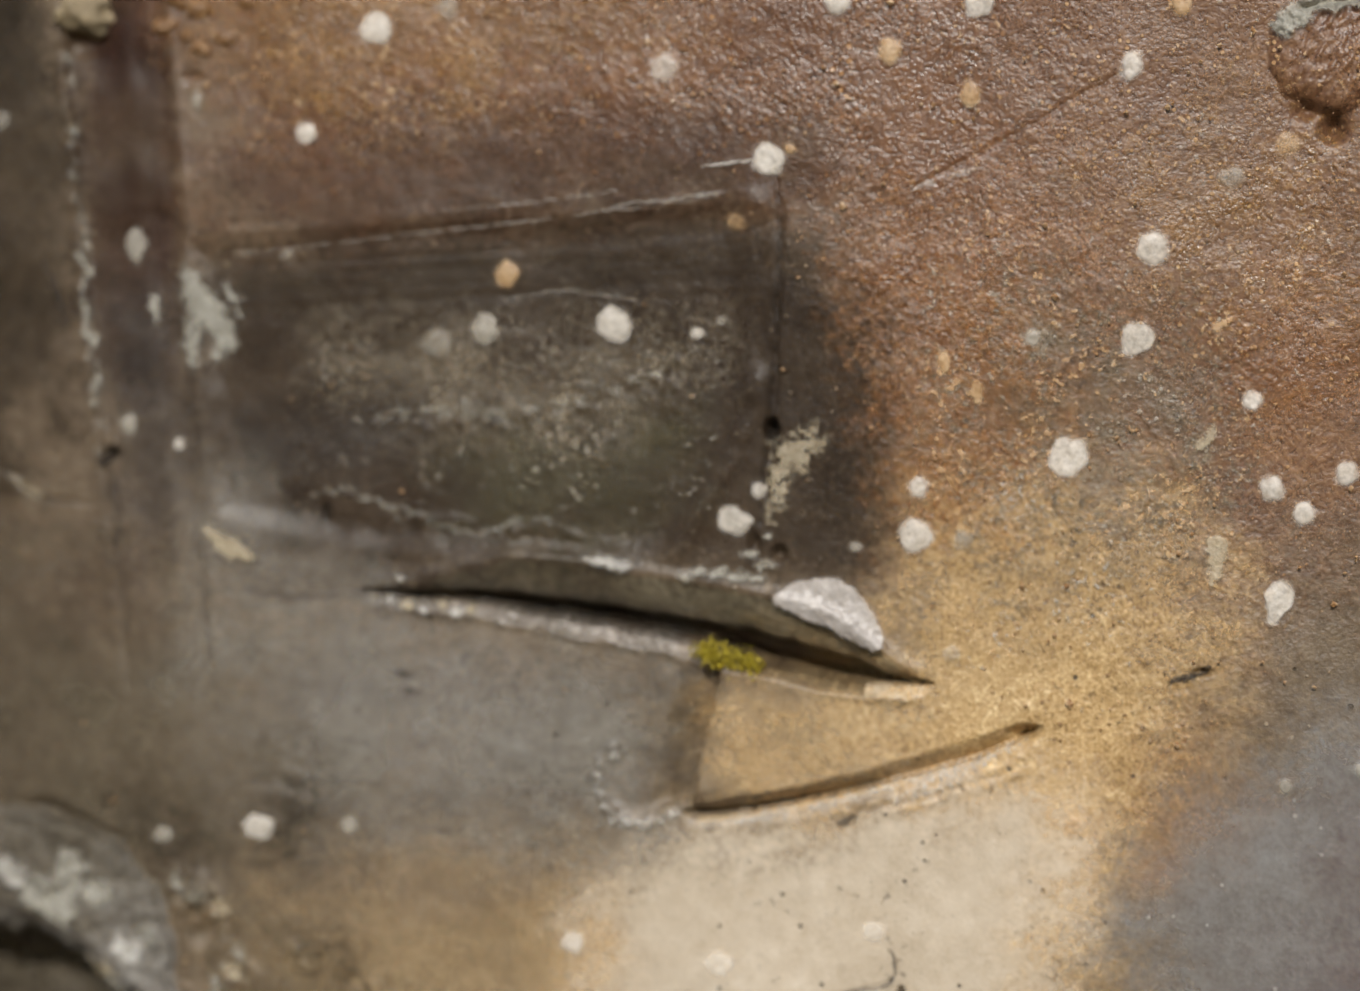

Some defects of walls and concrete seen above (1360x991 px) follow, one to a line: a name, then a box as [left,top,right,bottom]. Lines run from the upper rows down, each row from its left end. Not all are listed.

water stain [379,313,690,543]
rust [207,0,1360,930]
spalling [0,804,180,991]